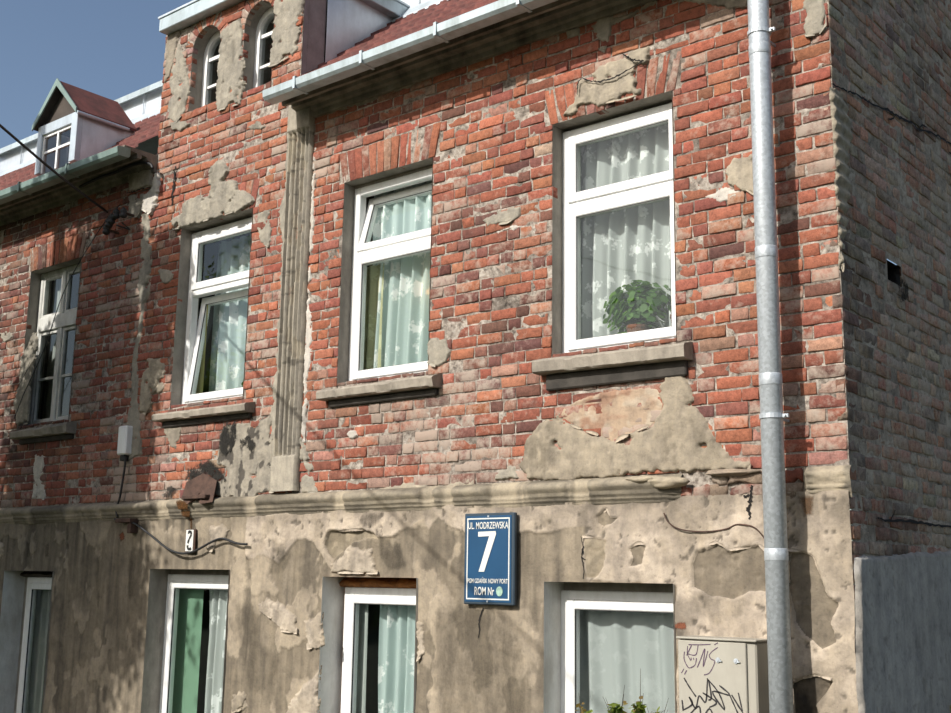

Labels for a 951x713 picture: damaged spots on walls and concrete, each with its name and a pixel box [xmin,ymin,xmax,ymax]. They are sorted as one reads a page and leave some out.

flaking render [215,18,247,112]
flaking render [268,0,305,68]
flaking render [563,0,748,117]
crack [832,83,951,154]
flaking render [171,133,289,255]
flaking render [126,170,174,460]
leakage [185,420,255,482]
flaking render [495,376,763,497]
flaking render [325,528,380,575]
spalling [693,540,766,599]
spalling [788,548,839,649]
spalling [792,673,832,713]